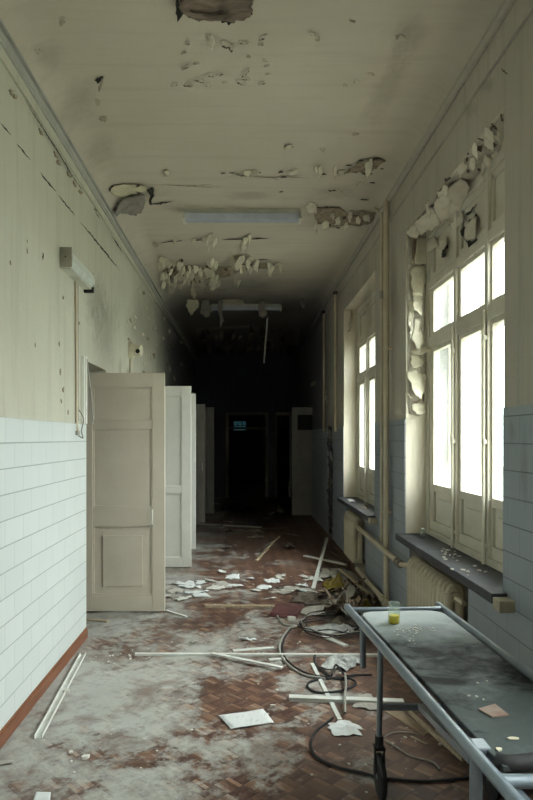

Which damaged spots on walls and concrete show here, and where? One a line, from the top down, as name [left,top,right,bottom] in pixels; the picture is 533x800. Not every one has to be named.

flaking render [175,0,254,26]
peeling [171,34,271,87]
crack [26,102,82,190]
crack [2,125,121,270]
flaking render [109,184,154,217]
peeling [306,202,376,234]
peeling [314,158,386,193]
peeling [406,114,504,416]
peeling [153,232,300,354]